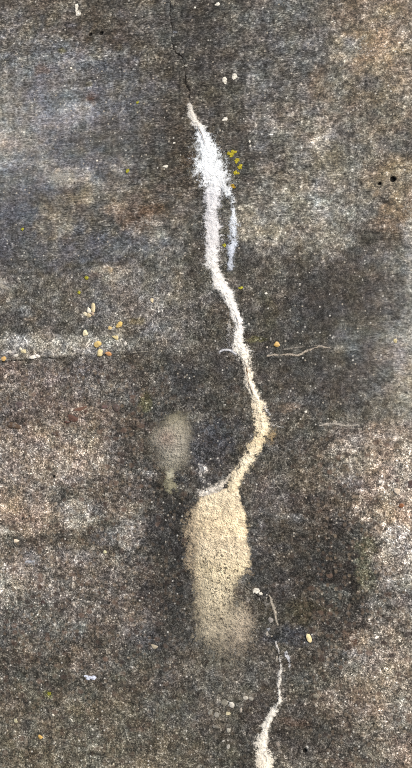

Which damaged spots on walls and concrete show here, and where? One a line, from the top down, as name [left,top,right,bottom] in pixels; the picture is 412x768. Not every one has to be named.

crack [170,0,191,97]
leakage [181,103,280,675]
leakage [267,345,330,357]
leakage [253,641,291,768]